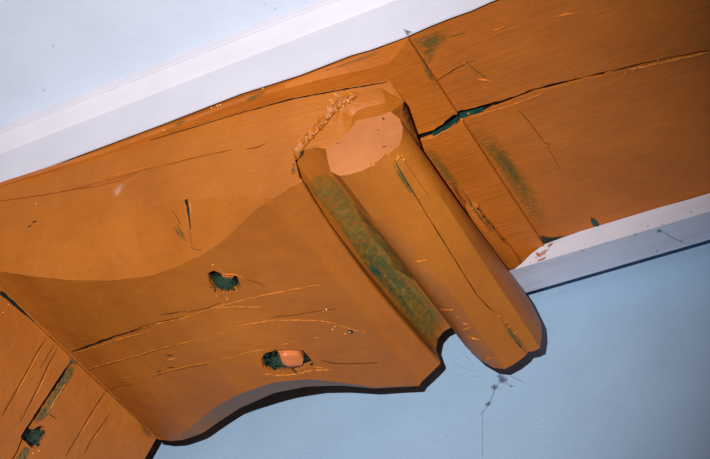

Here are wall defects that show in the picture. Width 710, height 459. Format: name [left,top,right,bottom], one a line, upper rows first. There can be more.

peeling [293,90,358,171]
crack [417,50,709,161]
crack [402,165,496,313]
crack [0,278,364,459]
crack [311,360,377,371]
crack [431,374,525,459]